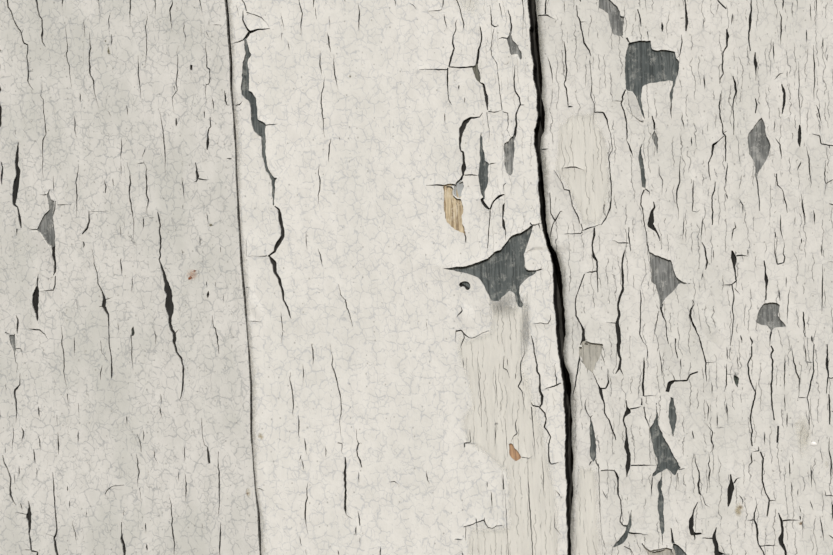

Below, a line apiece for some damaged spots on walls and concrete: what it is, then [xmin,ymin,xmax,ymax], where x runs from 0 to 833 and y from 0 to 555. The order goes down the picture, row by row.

peeling [599,0,679,138]
crack [1,143,22,230]
peeling [236,14,291,317]
crack [457,114,482,182]
peeling [748,118,770,211]
crack [105,152,185,415]
crack [522,0,681,524]
peeling [648,250,690,344]
crack [4,462,58,555]
peeling [444,197,557,555]
crack [456,307,561,554]
peeling [650,403,684,494]